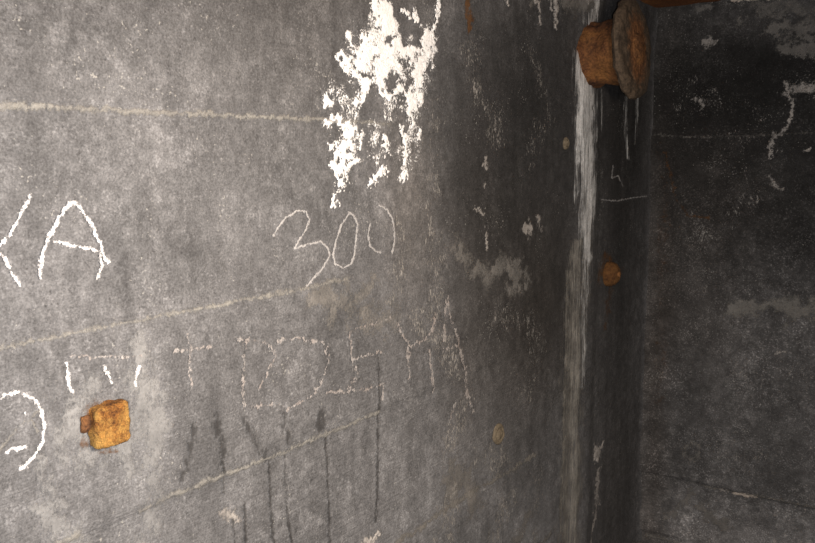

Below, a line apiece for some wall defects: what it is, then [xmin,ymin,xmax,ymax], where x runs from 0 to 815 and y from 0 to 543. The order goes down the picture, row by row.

efflorescence [322,0,445,209]
efflorescence [557,54,602,543]